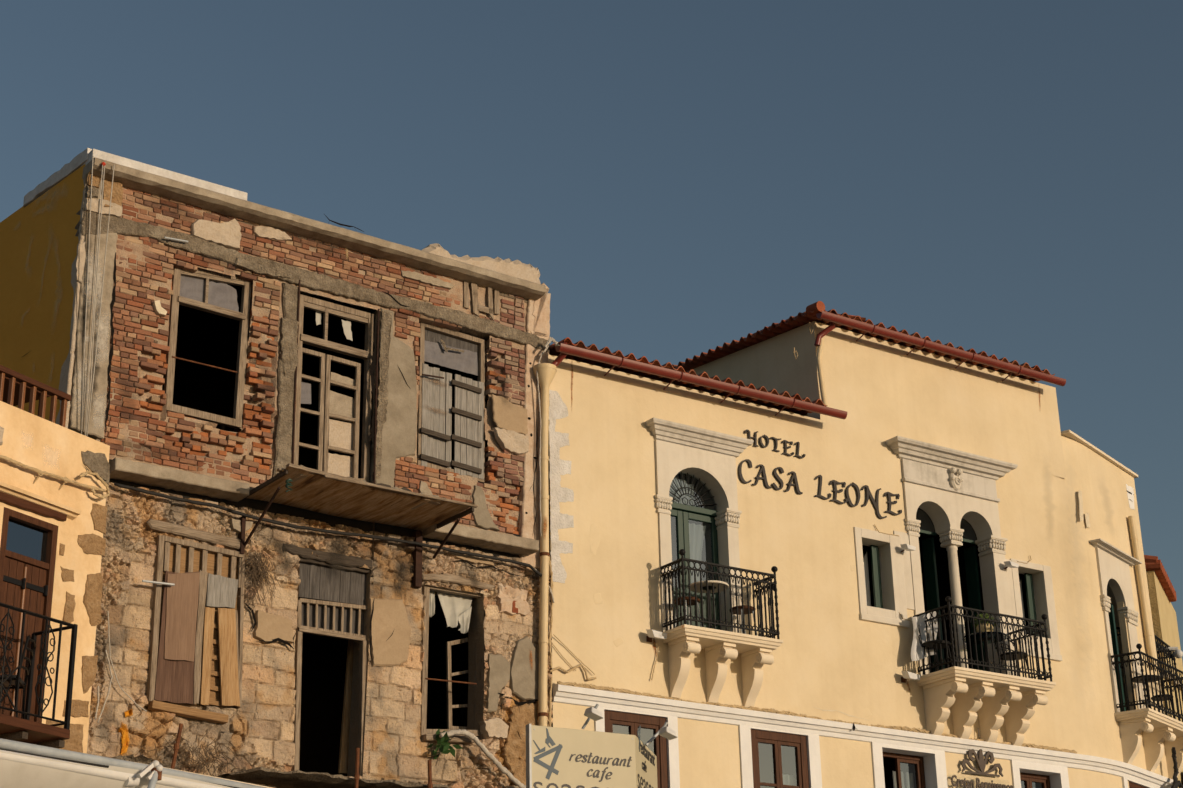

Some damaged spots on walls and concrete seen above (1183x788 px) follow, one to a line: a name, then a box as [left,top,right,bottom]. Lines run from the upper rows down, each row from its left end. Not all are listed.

spalling [84,172,123,218]
spalling [75,241,102,296]
peeling [86,319,108,355]
peeling [76,367,103,426]
spalling [348,311,403,492]
spalling [495,583,530,616]